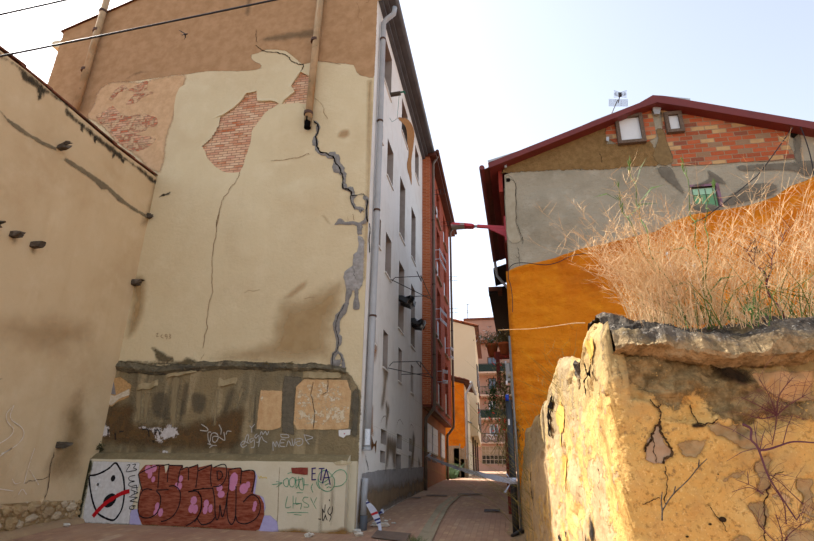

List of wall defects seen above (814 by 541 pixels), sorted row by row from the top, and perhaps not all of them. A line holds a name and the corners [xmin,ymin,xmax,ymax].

water stain [19,67,58,99]
water stain [4,115,57,150]
water stain [66,104,156,184]
flaking render [202,69,309,173]
flaking render [642,110,798,166]
water stain [65,158,148,222]
crack [201,172,240,359]
crack [274,99,371,368]
flaking render [257,390,282,430]
flaking render [294,371,351,430]
flaking render [617,356,814,464]
crack [763,471,784,541]